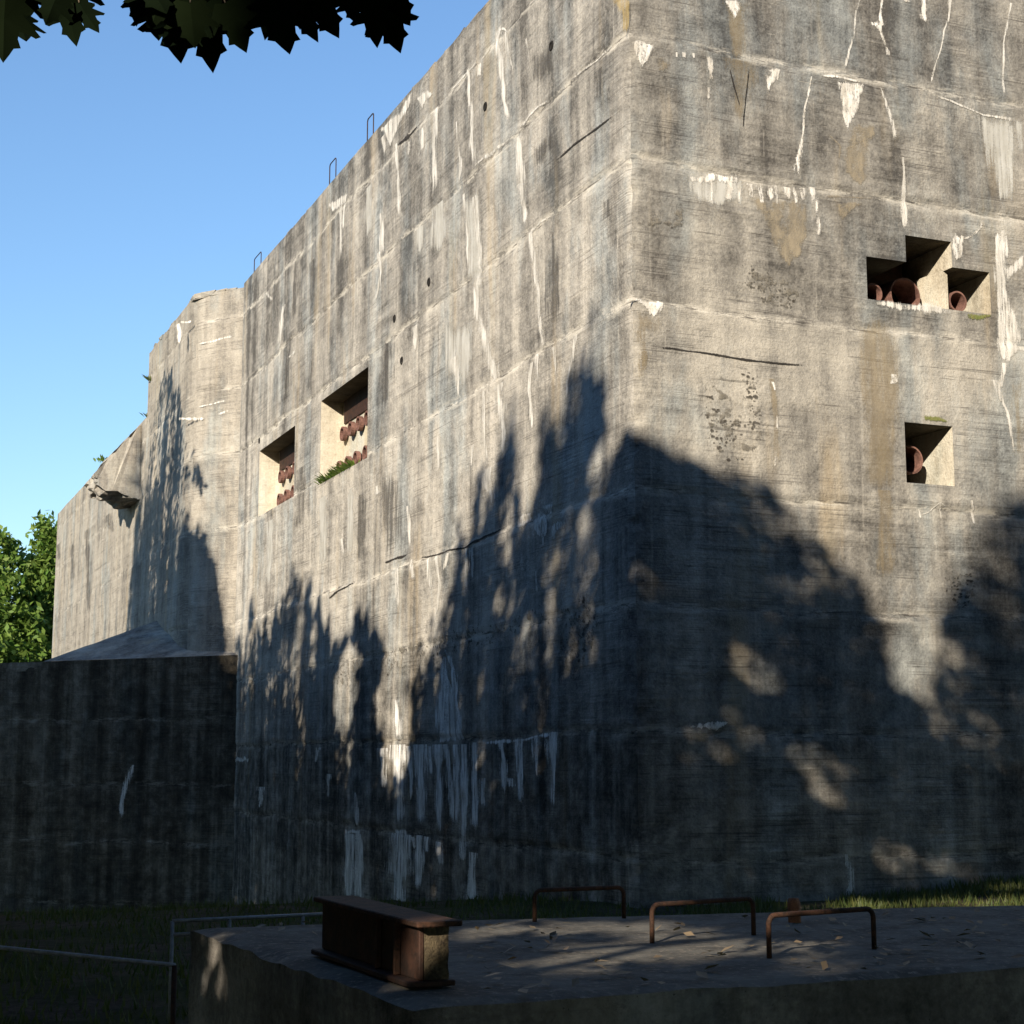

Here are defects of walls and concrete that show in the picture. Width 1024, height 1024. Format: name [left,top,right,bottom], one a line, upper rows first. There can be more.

crack [558,117,611,159]
crack [730,70,749,126]
damp [794,74,860,175]
damp [939,96,1023,200]
damp [452,25,578,430]
damp [689,173,821,235]
crack [662,347,799,365]
damp [991,230,1023,449]
crack [385,528,502,563]
damp [119,765,134,817]
damp [377,651,559,901]
damp [342,798,367,897]